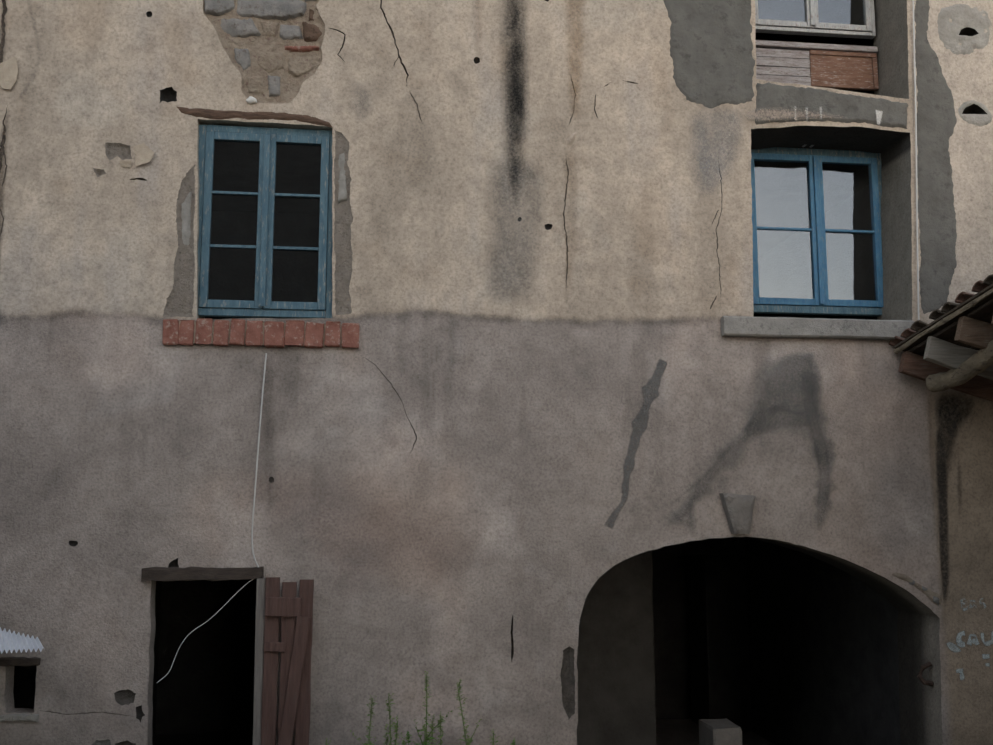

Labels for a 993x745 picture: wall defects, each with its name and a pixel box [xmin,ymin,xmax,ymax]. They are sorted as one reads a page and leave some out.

crack [0,0,18,237]
flaking render [93,142,154,177]
flaking render [203,0,325,104]
crack [380,0,422,122]
damp [505,0,524,182]
crack [569,78,637,124]
spalling [937,4,992,55]
crack [562,160,570,287]
flaking render [114,689,145,723]